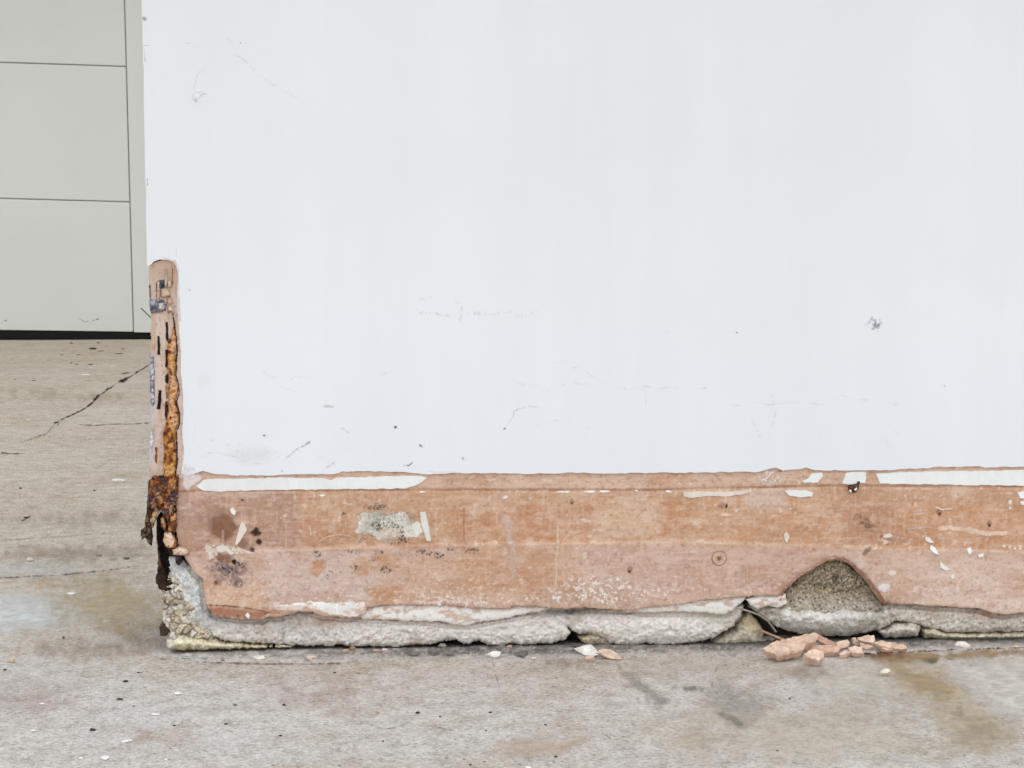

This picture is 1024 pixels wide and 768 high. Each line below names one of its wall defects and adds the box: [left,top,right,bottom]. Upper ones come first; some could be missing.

crack [1,366,147,454]
corrosion [155,325,178,483]
corrosion [160,513,190,566]
leakage [363,505,412,573]
peeling [156,466,1024,662]